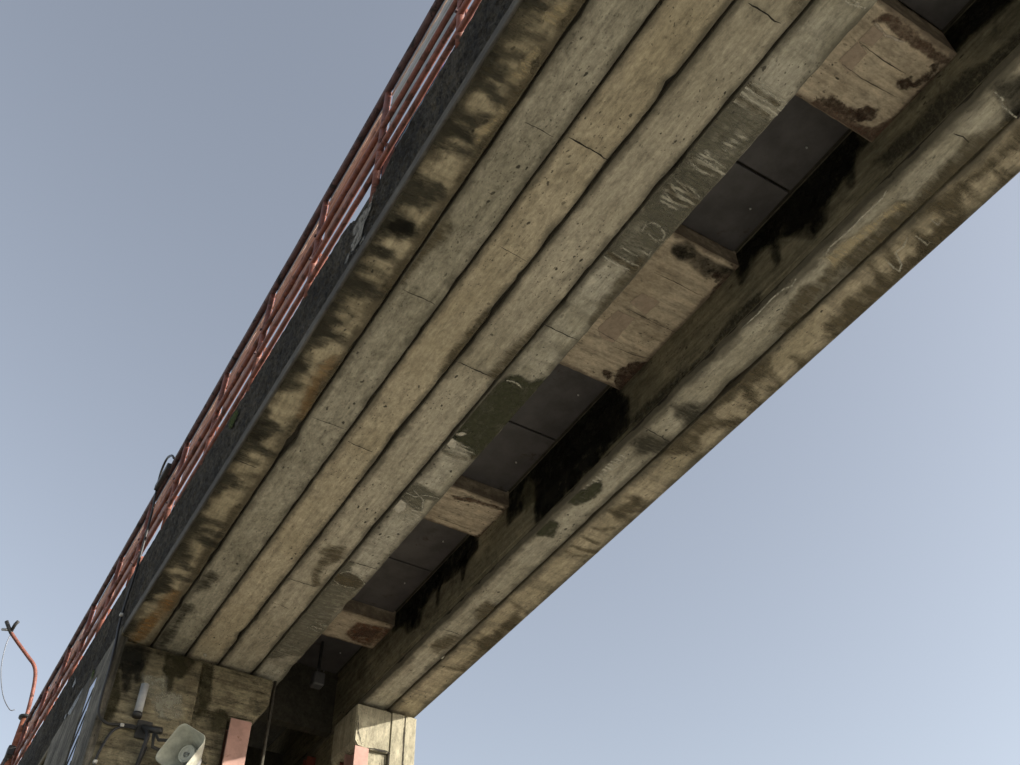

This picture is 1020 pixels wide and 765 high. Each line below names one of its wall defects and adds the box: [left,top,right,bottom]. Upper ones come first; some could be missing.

crack [749,3,781,24]
damp [873,30,1020,164]
damp [279,173,451,391]
damp [507,77,1020,538]
damp [232,353,347,465]
damp [103,605,228,730]
damp [147,473,240,602]
corrosion [347,623,390,645]
damp [393,535,478,632]